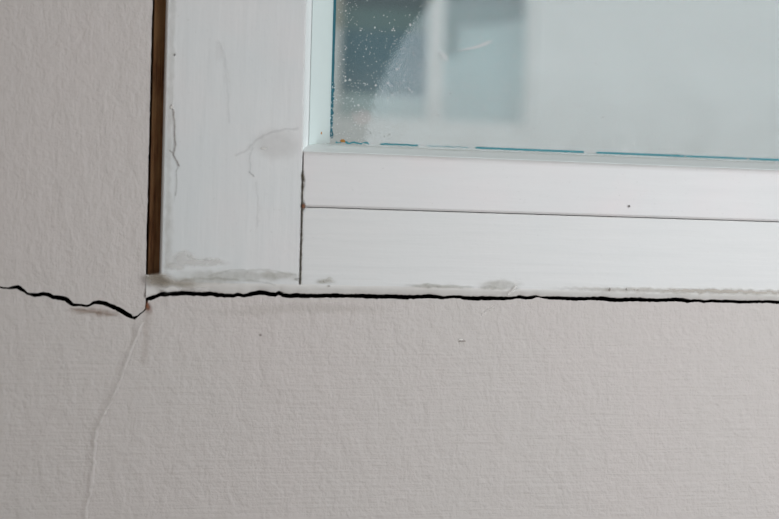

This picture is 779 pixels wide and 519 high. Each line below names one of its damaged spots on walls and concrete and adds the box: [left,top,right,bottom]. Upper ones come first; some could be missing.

crack [0,285,779,320]